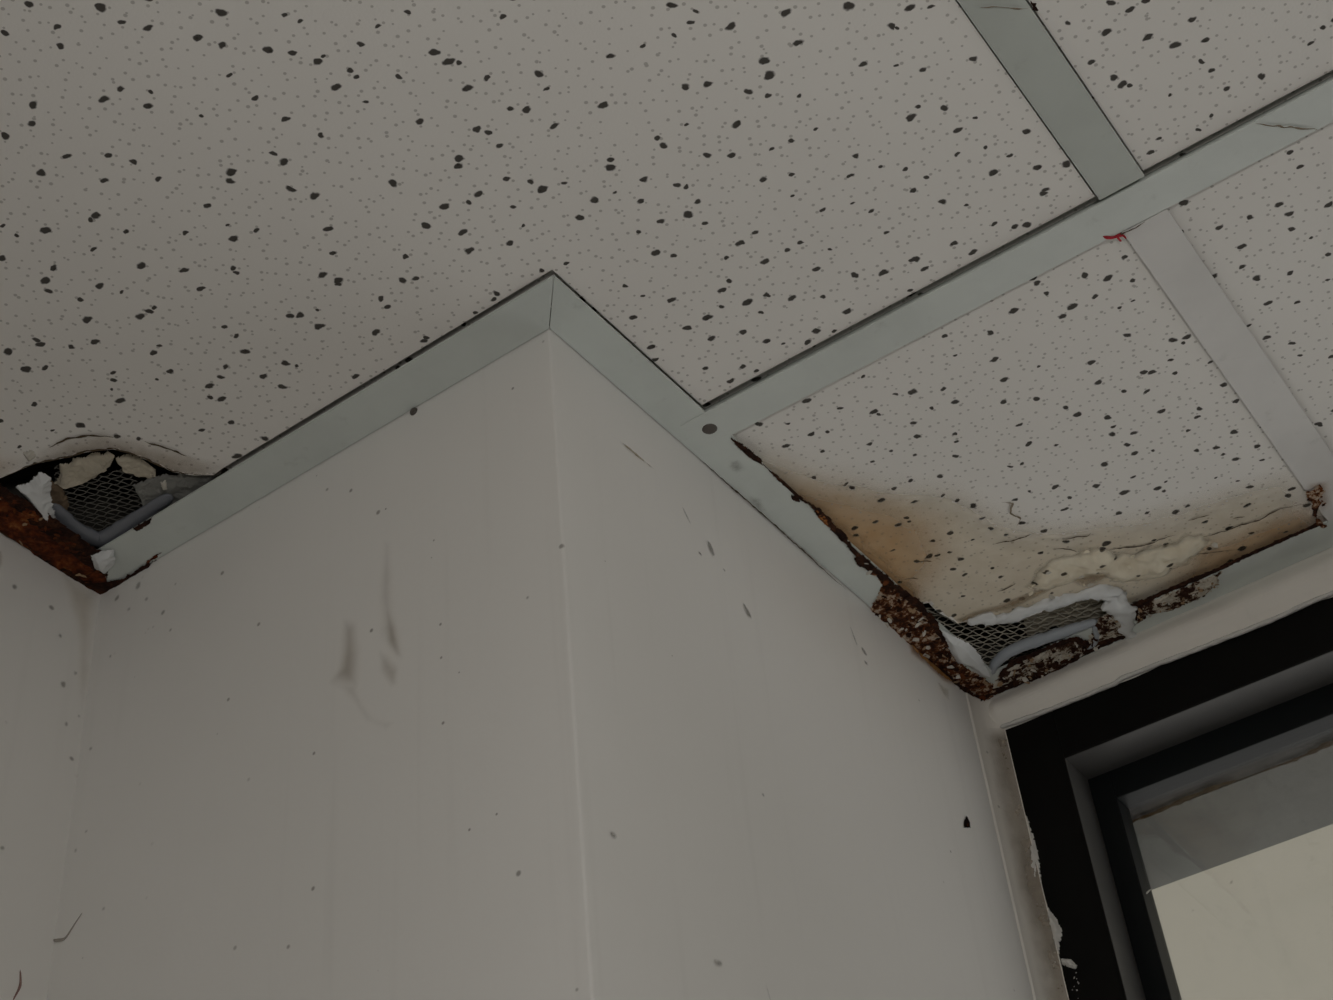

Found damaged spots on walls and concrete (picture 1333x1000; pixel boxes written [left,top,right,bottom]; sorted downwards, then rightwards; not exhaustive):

corrosion [0,484,161,595]
corrosion [731,438,1327,701]
leakage [778,475,1307,623]